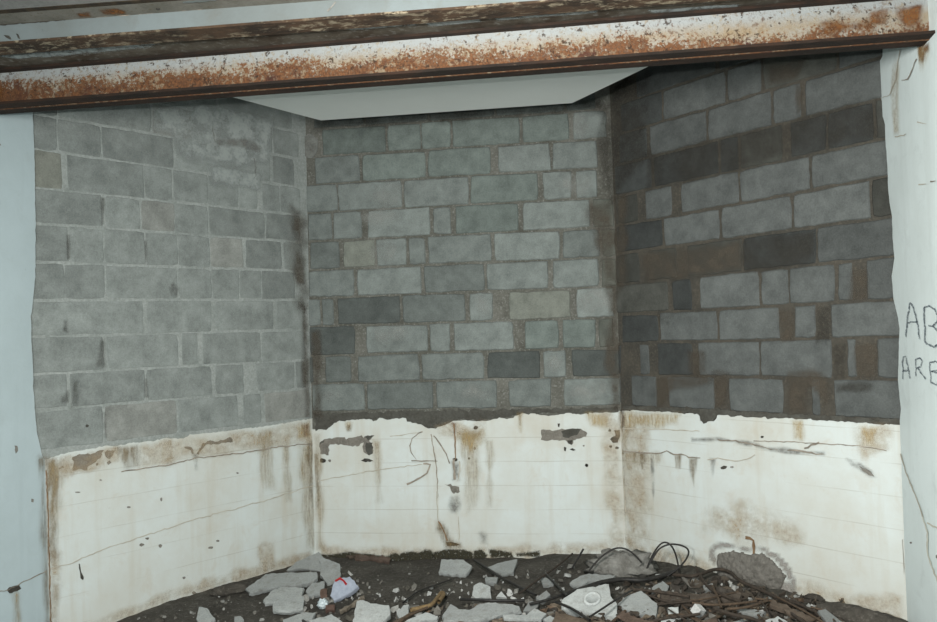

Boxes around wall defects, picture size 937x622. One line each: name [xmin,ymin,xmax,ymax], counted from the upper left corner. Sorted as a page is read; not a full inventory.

corrosion [824,11,886,32]
corrosion [899,6,921,27]
peeling [59,450,115,471]
spalling [319,435,374,463]
spalling [541,424,587,451]
peeling [608,429,755,475]
crack [0,425,460,592]
crack [753,440,937,581]
water stain [39,459,65,622]